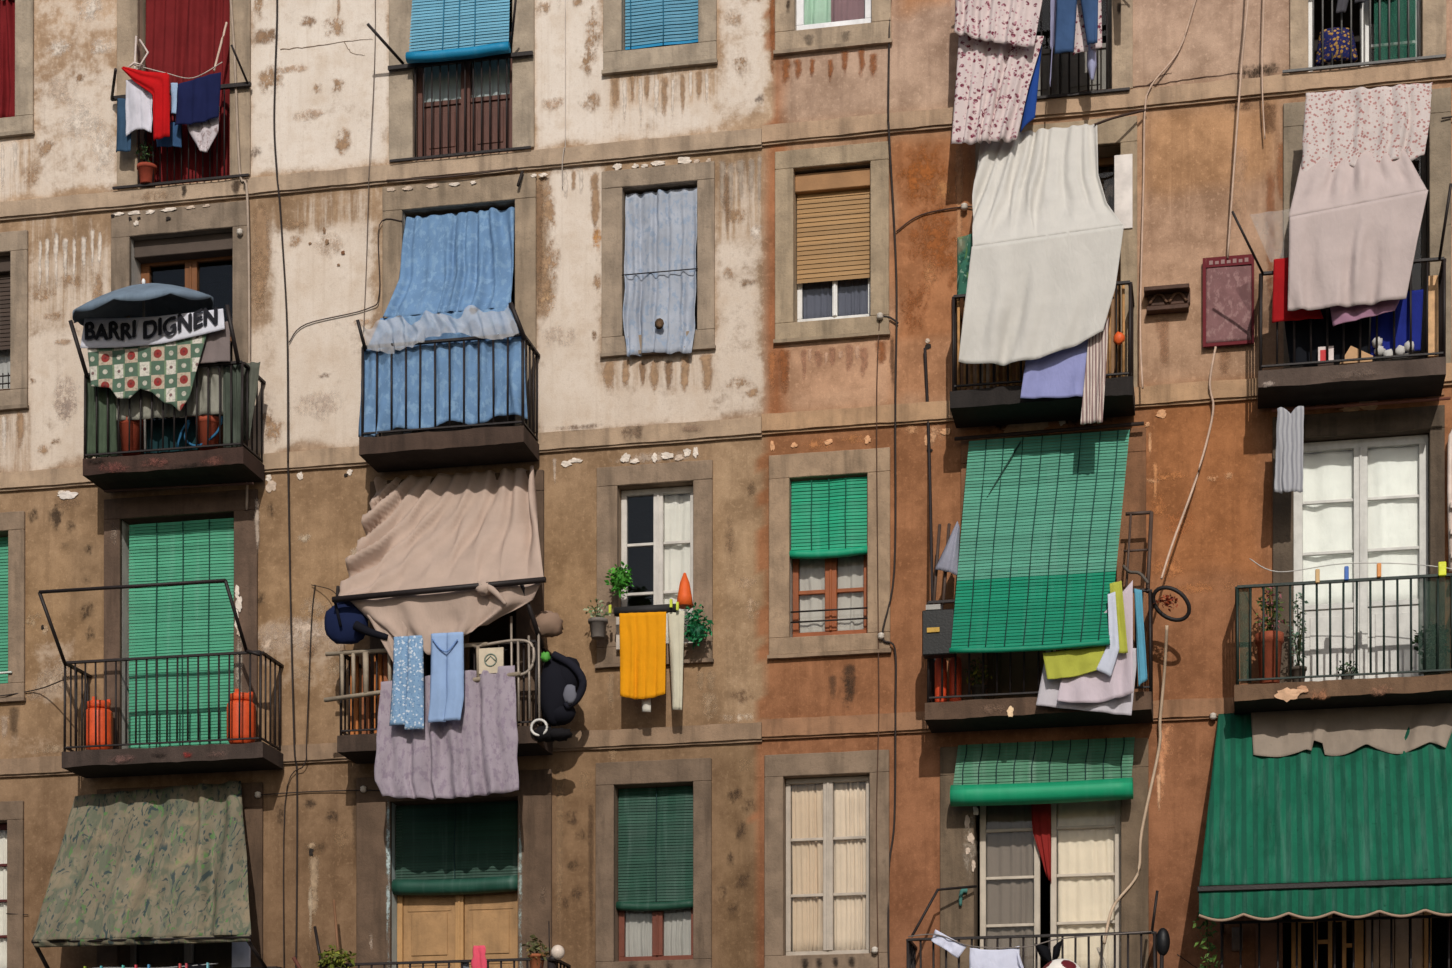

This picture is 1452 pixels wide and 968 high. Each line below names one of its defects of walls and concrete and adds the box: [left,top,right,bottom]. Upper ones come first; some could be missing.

peeling [255,0,276,43]
peeling [302,0,343,34]
peeling [573,0,600,72]
peeling [260,66,304,89]
water stain [612,71,708,118]
peeling [335,130,350,154]
water stain [603,354,712,390]